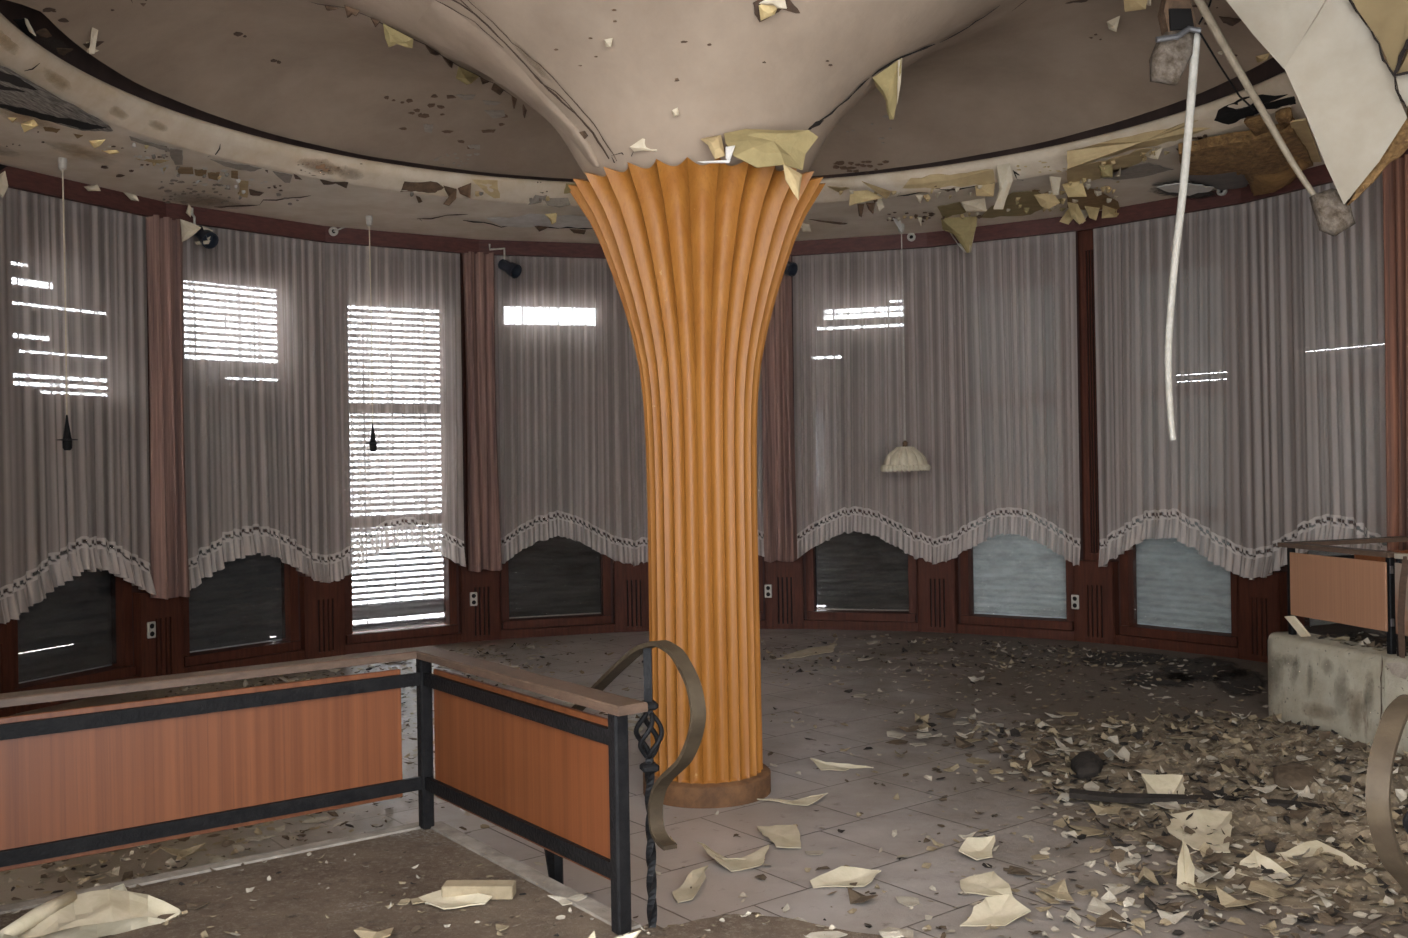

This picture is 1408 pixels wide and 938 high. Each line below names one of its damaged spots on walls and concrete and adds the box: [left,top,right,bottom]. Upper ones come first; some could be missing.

peeling [753,0,800,22]
peeling [1089,0,1151,40]
peeling [1204,7,1241,26]
crack [1349,0,1408,108]
spalling [0,66,302,245]
peeling [320,179,348,188]
peeling [611,139,657,163]
peeling [699,129,818,200]
spalling [801,58,1322,253]